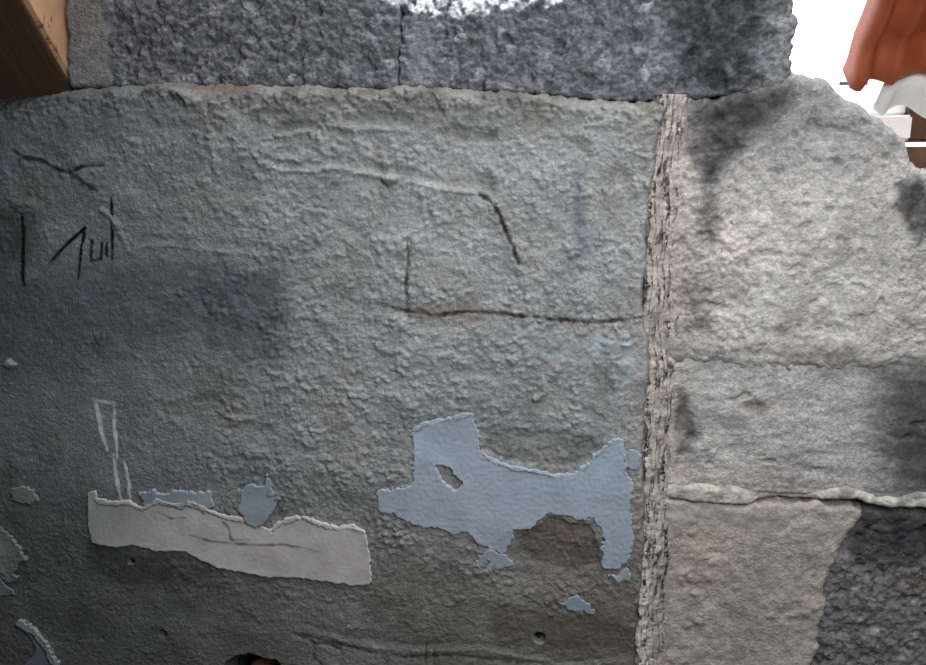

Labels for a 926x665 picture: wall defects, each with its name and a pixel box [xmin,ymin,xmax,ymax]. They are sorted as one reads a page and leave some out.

crack [479,193,519,264]
crack [396,252,415,313]
crack [440,310,644,325]
peeling [0,526,28,596]
peeling [87,473,372,586]
peeling [376,412,642,583]
peeling [560,595,595,615]
peeling [14,618,61,665]